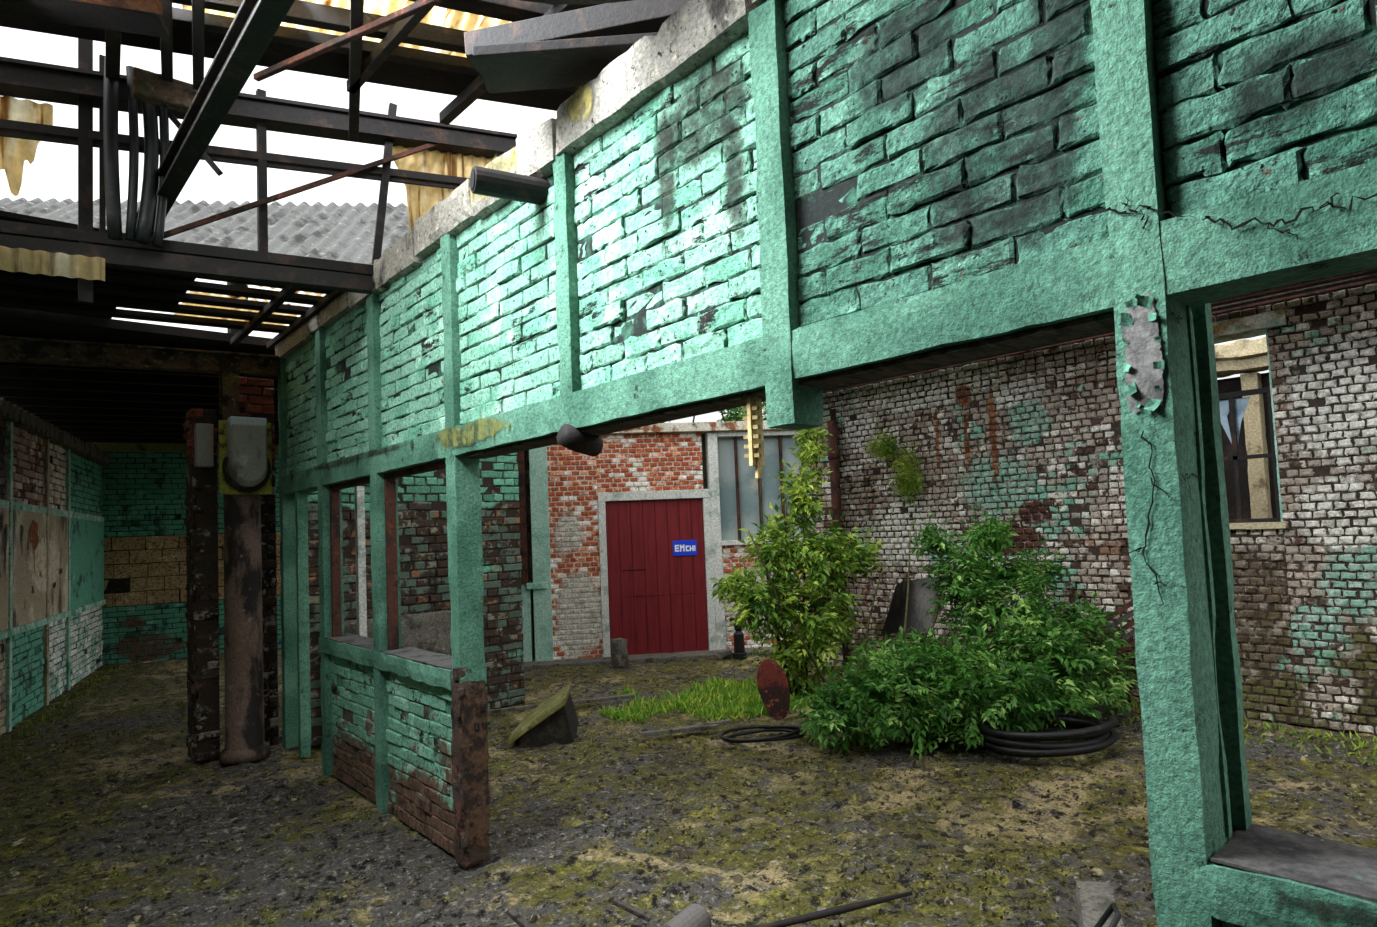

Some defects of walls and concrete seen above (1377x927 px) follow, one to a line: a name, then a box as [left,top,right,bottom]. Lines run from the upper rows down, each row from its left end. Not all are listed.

water stain [656,66,745,233]
crack [1105,191,1377,241]
peeling [1119,293,1164,415]
rust [934,408,942,484]
rust [955,385,999,487]
peeling [959,379,1054,607]
crack [1128,431,1200,620]